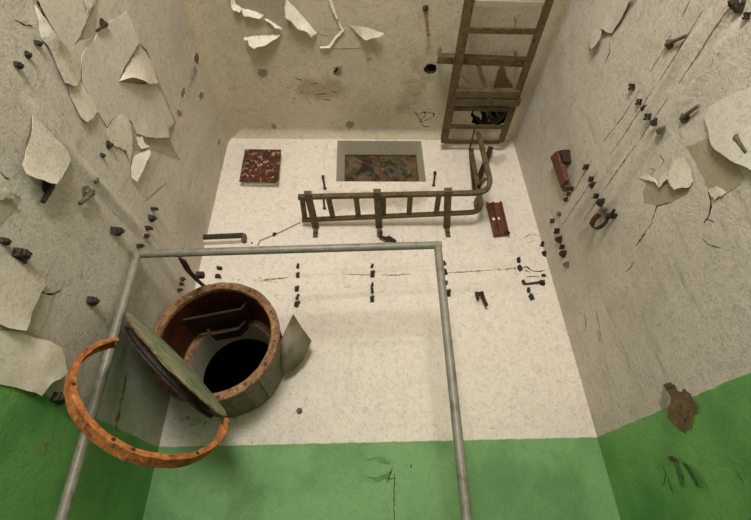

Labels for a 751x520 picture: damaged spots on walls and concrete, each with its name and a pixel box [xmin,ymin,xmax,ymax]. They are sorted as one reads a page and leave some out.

peeling [229,0,384,49]
peeling [589,0,637,49]
peeling [22,114,71,186]
peeling [32,0,180,182]
crack [562,2,729,225]
peeling [640,88,751,206]
crack [626,202,671,272]
crack [702,193,721,248]
peeling [0,256,72,400]